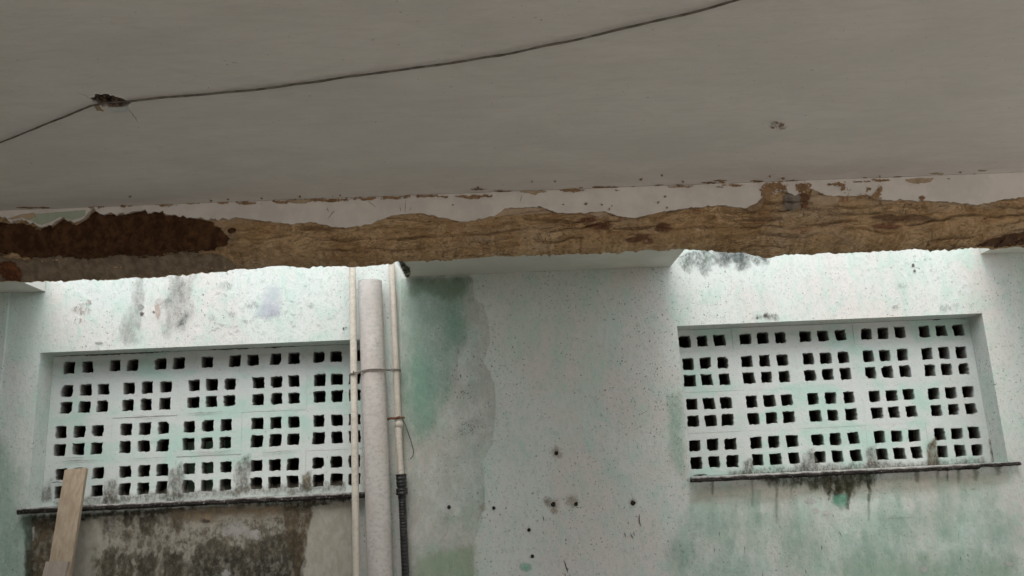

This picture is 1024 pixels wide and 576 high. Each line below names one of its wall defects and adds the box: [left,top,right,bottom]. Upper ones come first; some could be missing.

spalling [0,172,1024,295]
damp [684,250,767,272]
damp [22,487,57,576]
damp [72,456,353,576]